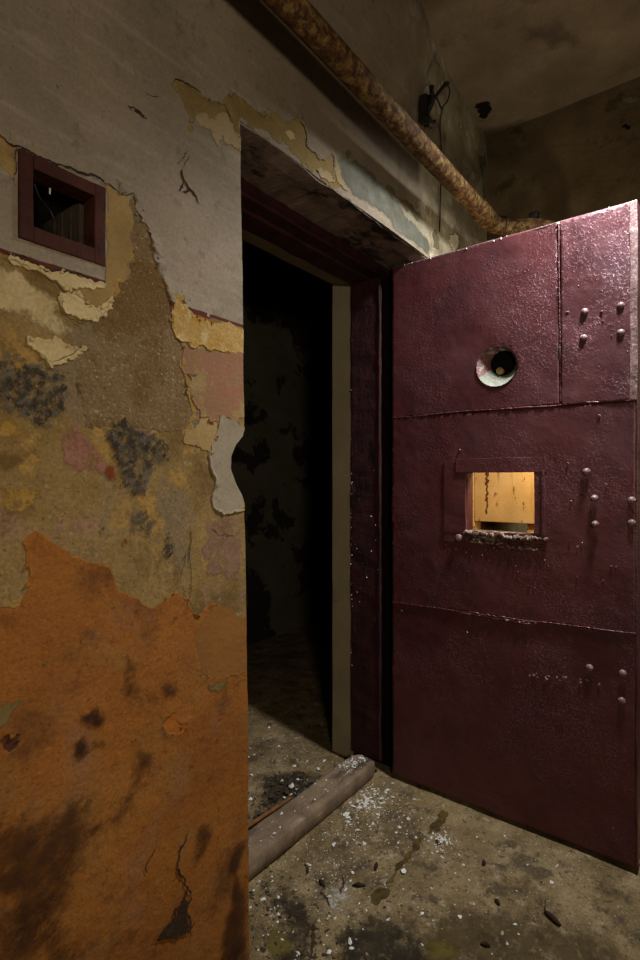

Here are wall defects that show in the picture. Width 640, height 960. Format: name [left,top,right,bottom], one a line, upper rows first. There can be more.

peeling [0,121,21,192]
crack [178,152,199,203]
peeling [164,67,431,259]
damp [0,350,70,429]
peeling [0,171,247,692]
damp [105,417,169,536]
damp [83,710,104,726]
crack [156,834,195,942]
damp [224,844,246,960]